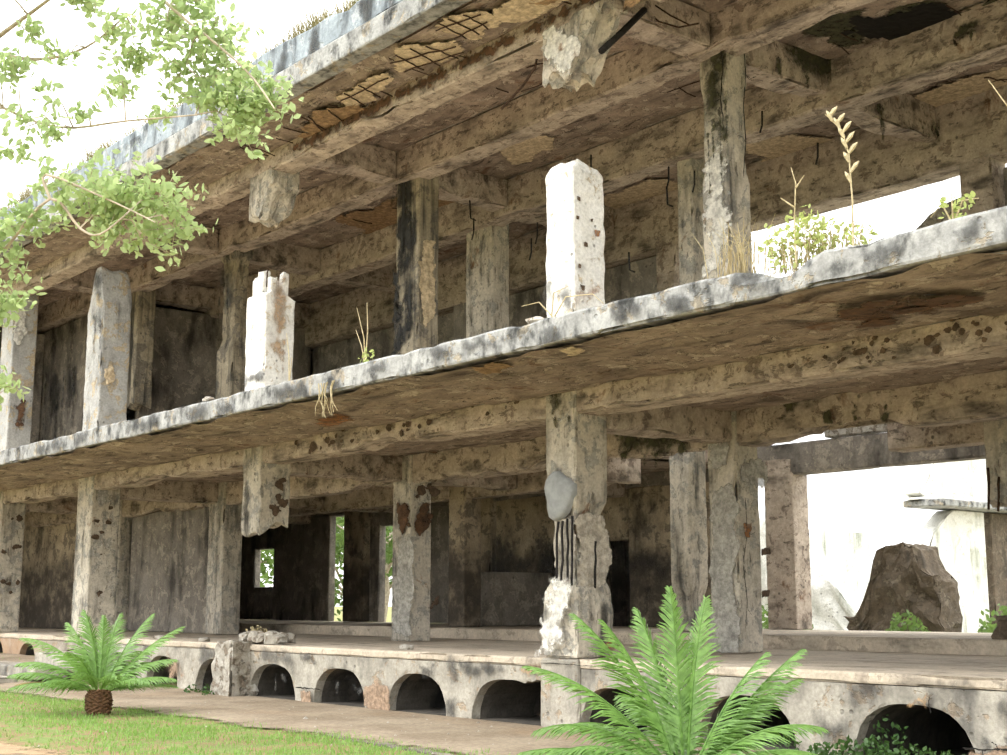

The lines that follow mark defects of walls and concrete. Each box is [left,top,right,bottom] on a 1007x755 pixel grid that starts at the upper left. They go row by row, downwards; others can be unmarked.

spalling [598,0,699,54]
peeling [802,8,866,55]
spalling [276,0,582,143]
leakage [706,99,728,195]
leakage [862,236,899,265]
leakage [962,220,977,240]
leakage [367,180,417,378]
leakage [666,295,689,312]
leakage [730,272,763,292]
spalling [269,478,288,516]
rust [397,502,433,536]
spalling [521,512,613,674]